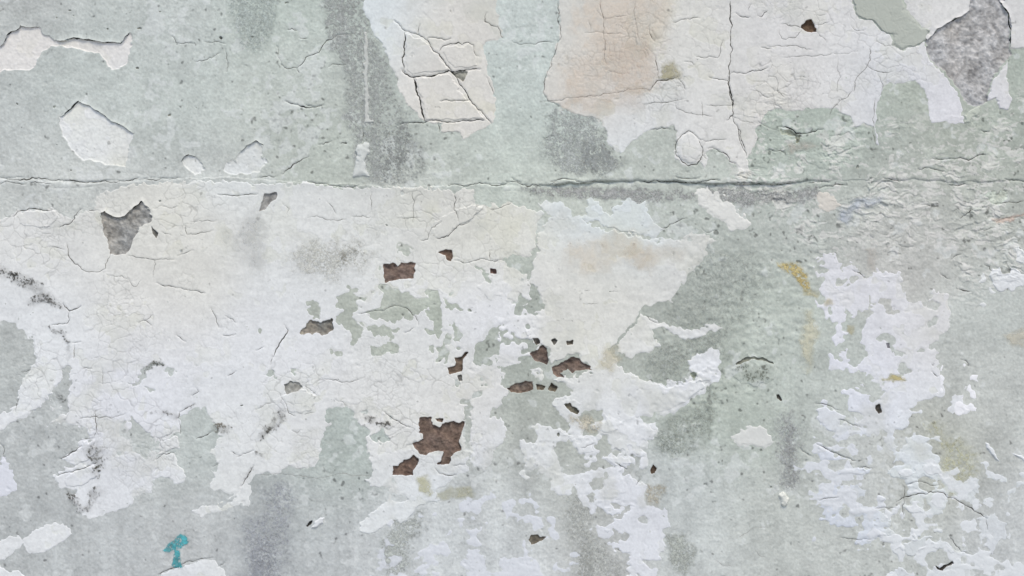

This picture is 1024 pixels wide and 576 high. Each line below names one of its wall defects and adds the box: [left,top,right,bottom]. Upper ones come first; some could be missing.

peeling [0,22,142,72]
crack [397,23,494,132]
peeling [543,0,1024,180]
crack [6,176,178,184]
crack [14,208,236,336]
crack [410,178,591,263]
peeling [0,137,751,576]
peeling [793,247,1024,576]